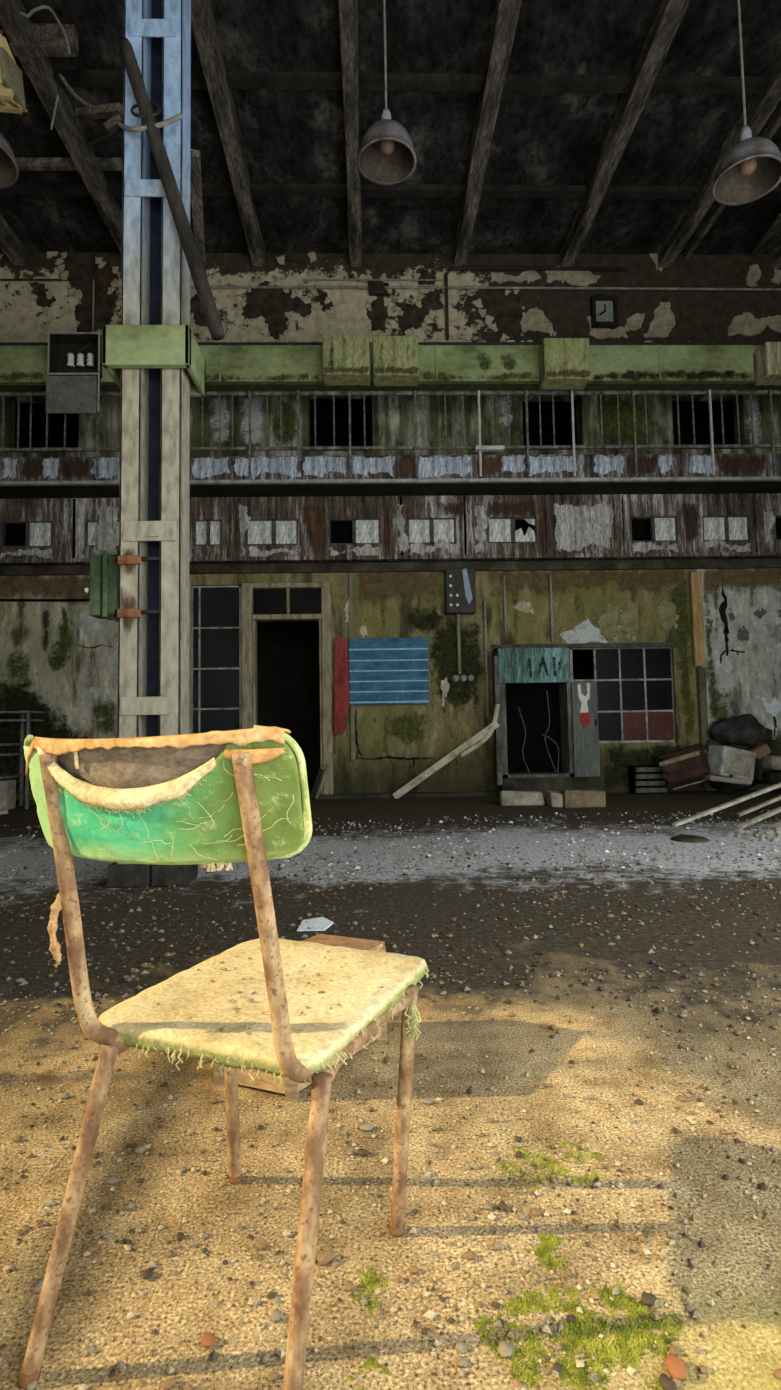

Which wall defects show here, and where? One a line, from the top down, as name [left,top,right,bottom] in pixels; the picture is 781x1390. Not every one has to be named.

peeling [27,252,119,334]
peeling [366,267,449,342]
peeling [472,266,600,342]
peeling [587,302,676,342]
peeling [728,312,781,336]
peeling [746,264,781,287]
damp [359,572,483,712]
crack [719,587,745,664]
damp [0,575,115,792]